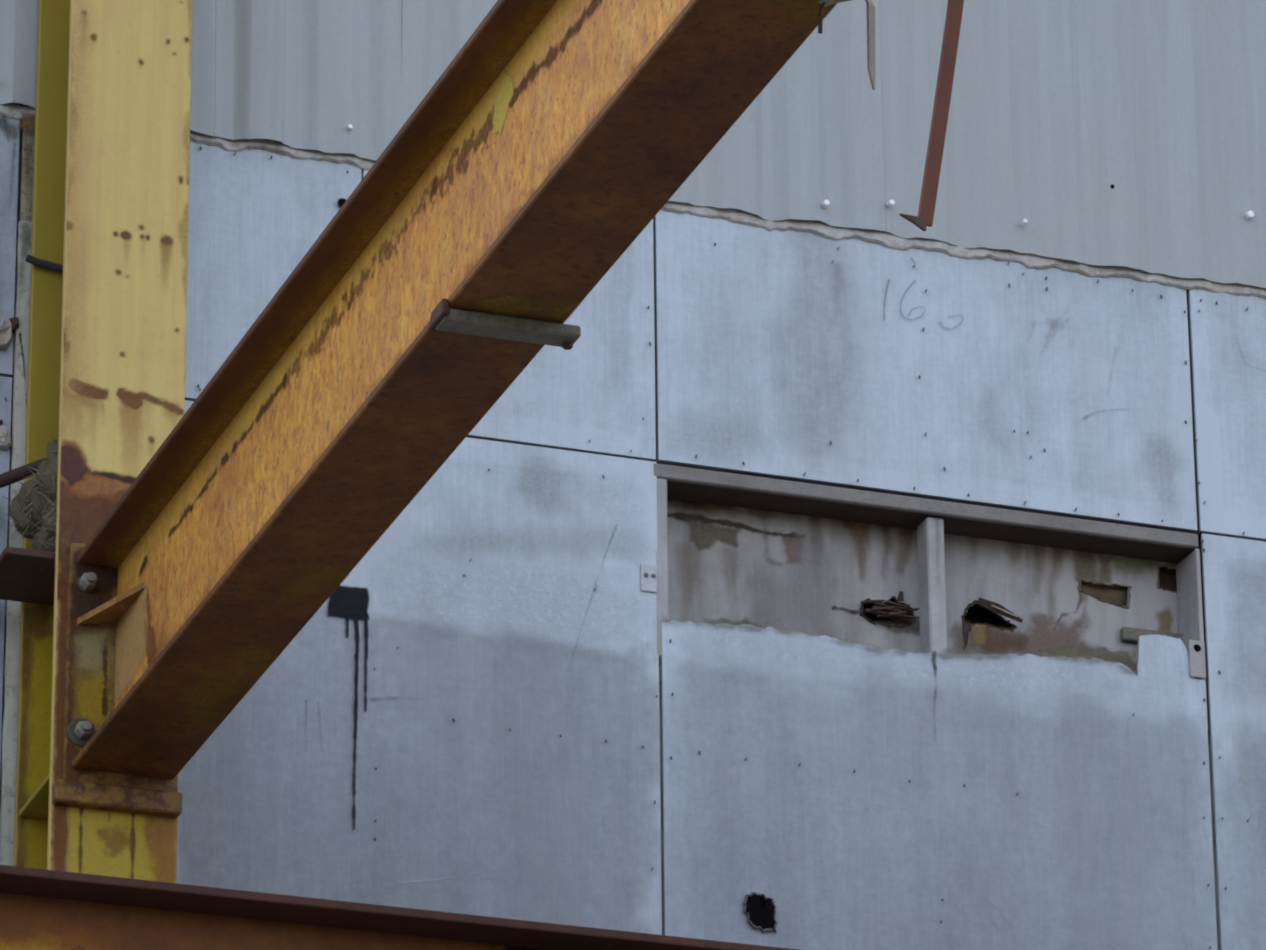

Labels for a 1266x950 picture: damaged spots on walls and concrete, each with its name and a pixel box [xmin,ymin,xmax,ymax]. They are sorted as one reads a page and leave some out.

rust [509,0,602,107]
rust [114,226,172,250]
rust [169,106,494,536]
rust [69,379,184,414]
rust [144,592,156,665]
spalling [832,591,920,633]
spalling [961,597,1027,654]
spalling [1077,579,1132,609]
spalling [1157,565,1177,593]